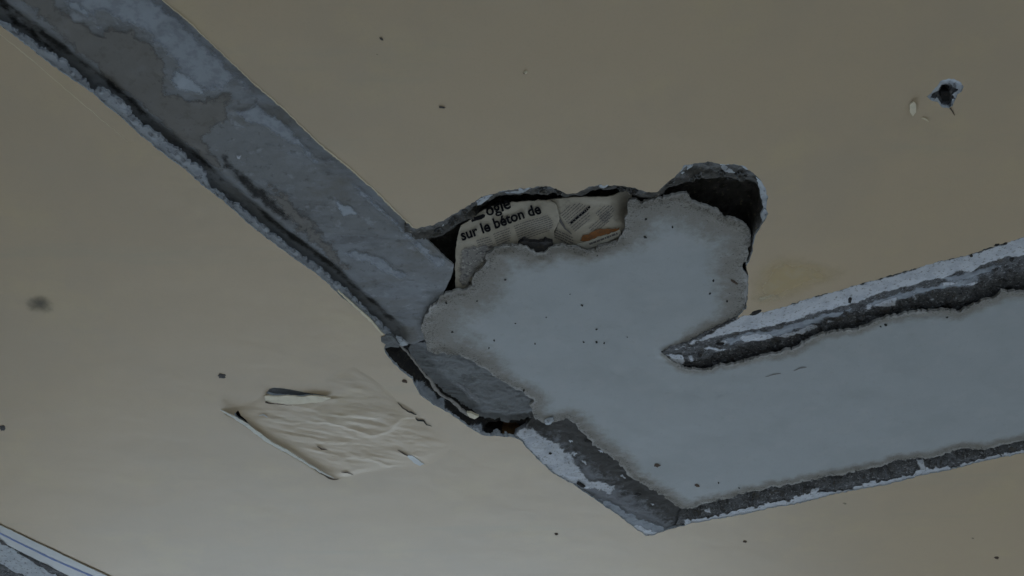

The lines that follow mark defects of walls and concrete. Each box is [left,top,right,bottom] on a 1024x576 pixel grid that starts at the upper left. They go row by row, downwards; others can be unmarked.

spalling [0,0,768,419]
spalling [661,237,1024,368]
peeling [493,416,1024,535]